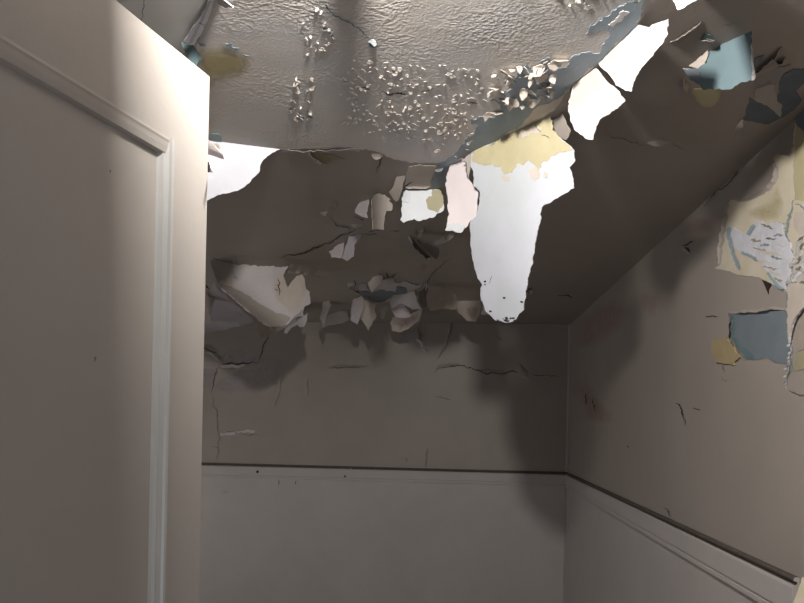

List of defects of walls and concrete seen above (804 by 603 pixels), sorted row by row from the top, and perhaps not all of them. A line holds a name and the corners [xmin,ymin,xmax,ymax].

crack [319,3,372,41]
peeling [179,0,804,385]
crack [204,339,267,461]
crack [415,338,560,380]